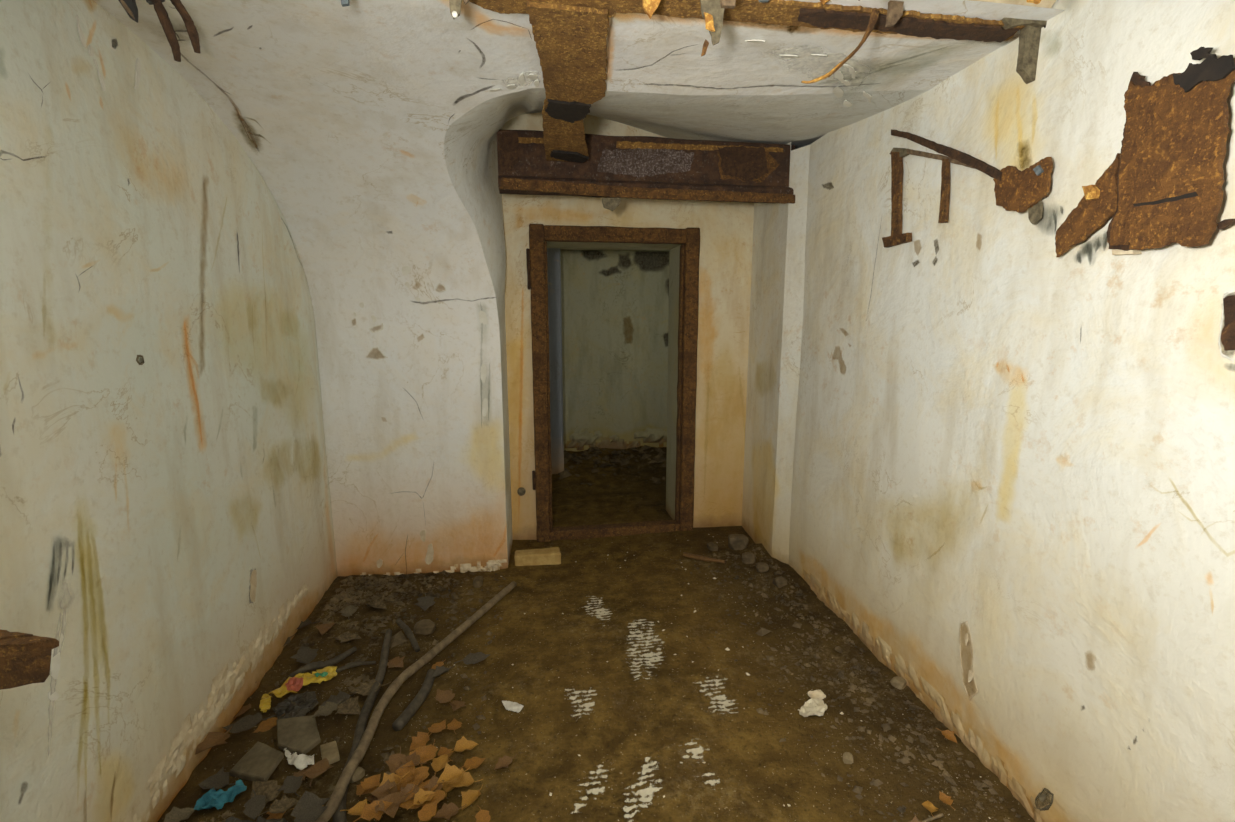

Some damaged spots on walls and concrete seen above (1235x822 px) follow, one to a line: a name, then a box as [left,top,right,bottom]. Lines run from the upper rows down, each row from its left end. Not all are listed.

rust [704,12,715,32]
spalling [1218,288,1235,362]
rust [0,630,33,640]